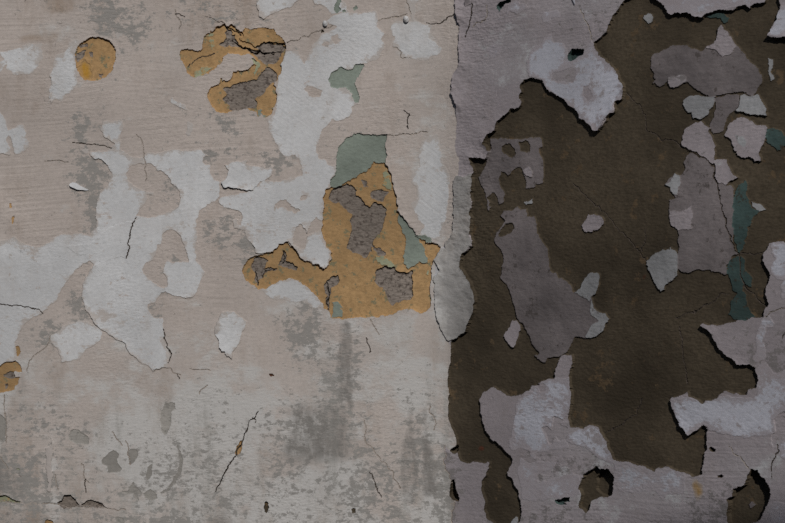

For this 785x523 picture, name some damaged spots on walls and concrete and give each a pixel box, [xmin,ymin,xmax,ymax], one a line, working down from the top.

peeling [0,43,43,75]
peeling [48,33,122,103]
crack [378,0,488,38]
peeling [0,120,220,393]
spalling [179,0,785,523]
crack [215,411,259,492]